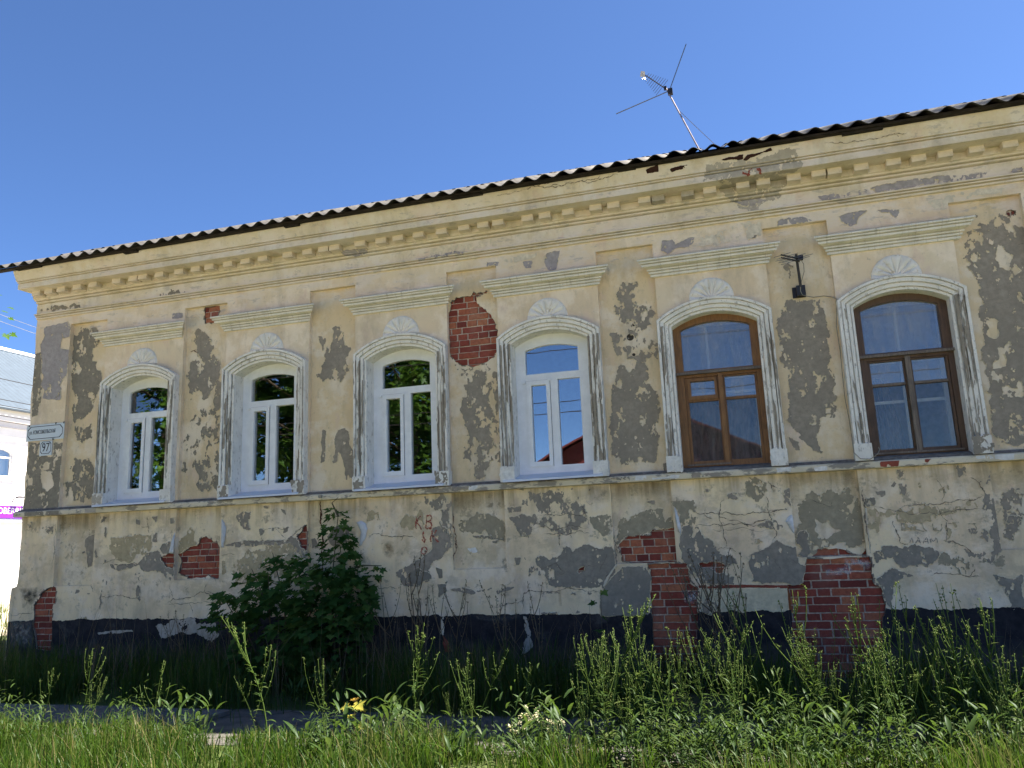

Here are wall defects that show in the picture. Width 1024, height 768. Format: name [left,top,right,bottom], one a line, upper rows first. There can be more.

peeling [23,303,350,601]
peeling [316,326,365,489]
peeling [396,281,1024,680]
crack [692,482,785,552]
crack [861,478,985,577]
peeling [954,210,1024,460]
spalling [33,586,57,650]